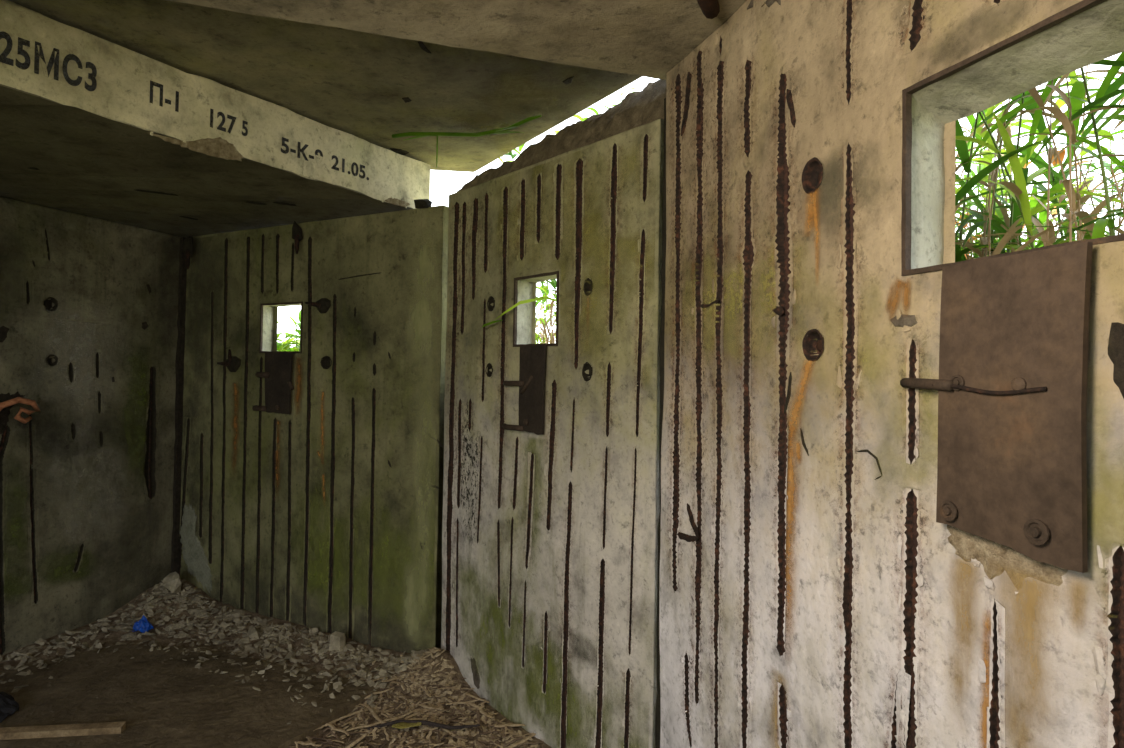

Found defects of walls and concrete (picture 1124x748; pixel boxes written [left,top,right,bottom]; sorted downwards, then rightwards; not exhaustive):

spalling [148,131,243,162]
rust [806,191,819,268]
spalling [1107,322,1124,399]
rust [785,360,813,617]